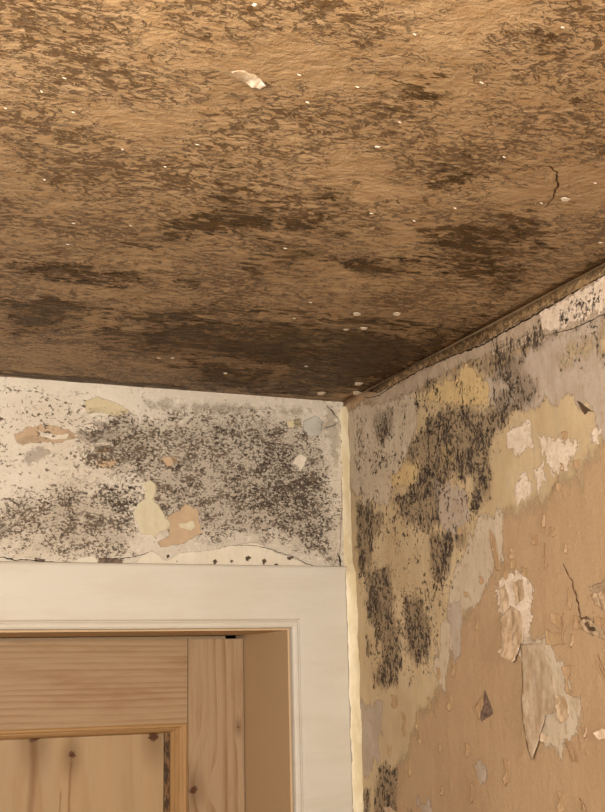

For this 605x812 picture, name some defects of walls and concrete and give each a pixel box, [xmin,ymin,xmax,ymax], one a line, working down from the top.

peeling [227,70,267,91]
crack [512,166,559,207]
leakage [118,182,556,298]
leakage [2,254,151,292]
peeling [14,422,119,469]
leakage [0,294,496,564]
peeling [293,454,307,472]
flaking render [98,553,146,563]
peeling [158,504,201,547]
leakage [354,362,537,688]
peeling [348,276,605,812]
leakage [364,760,397,812]